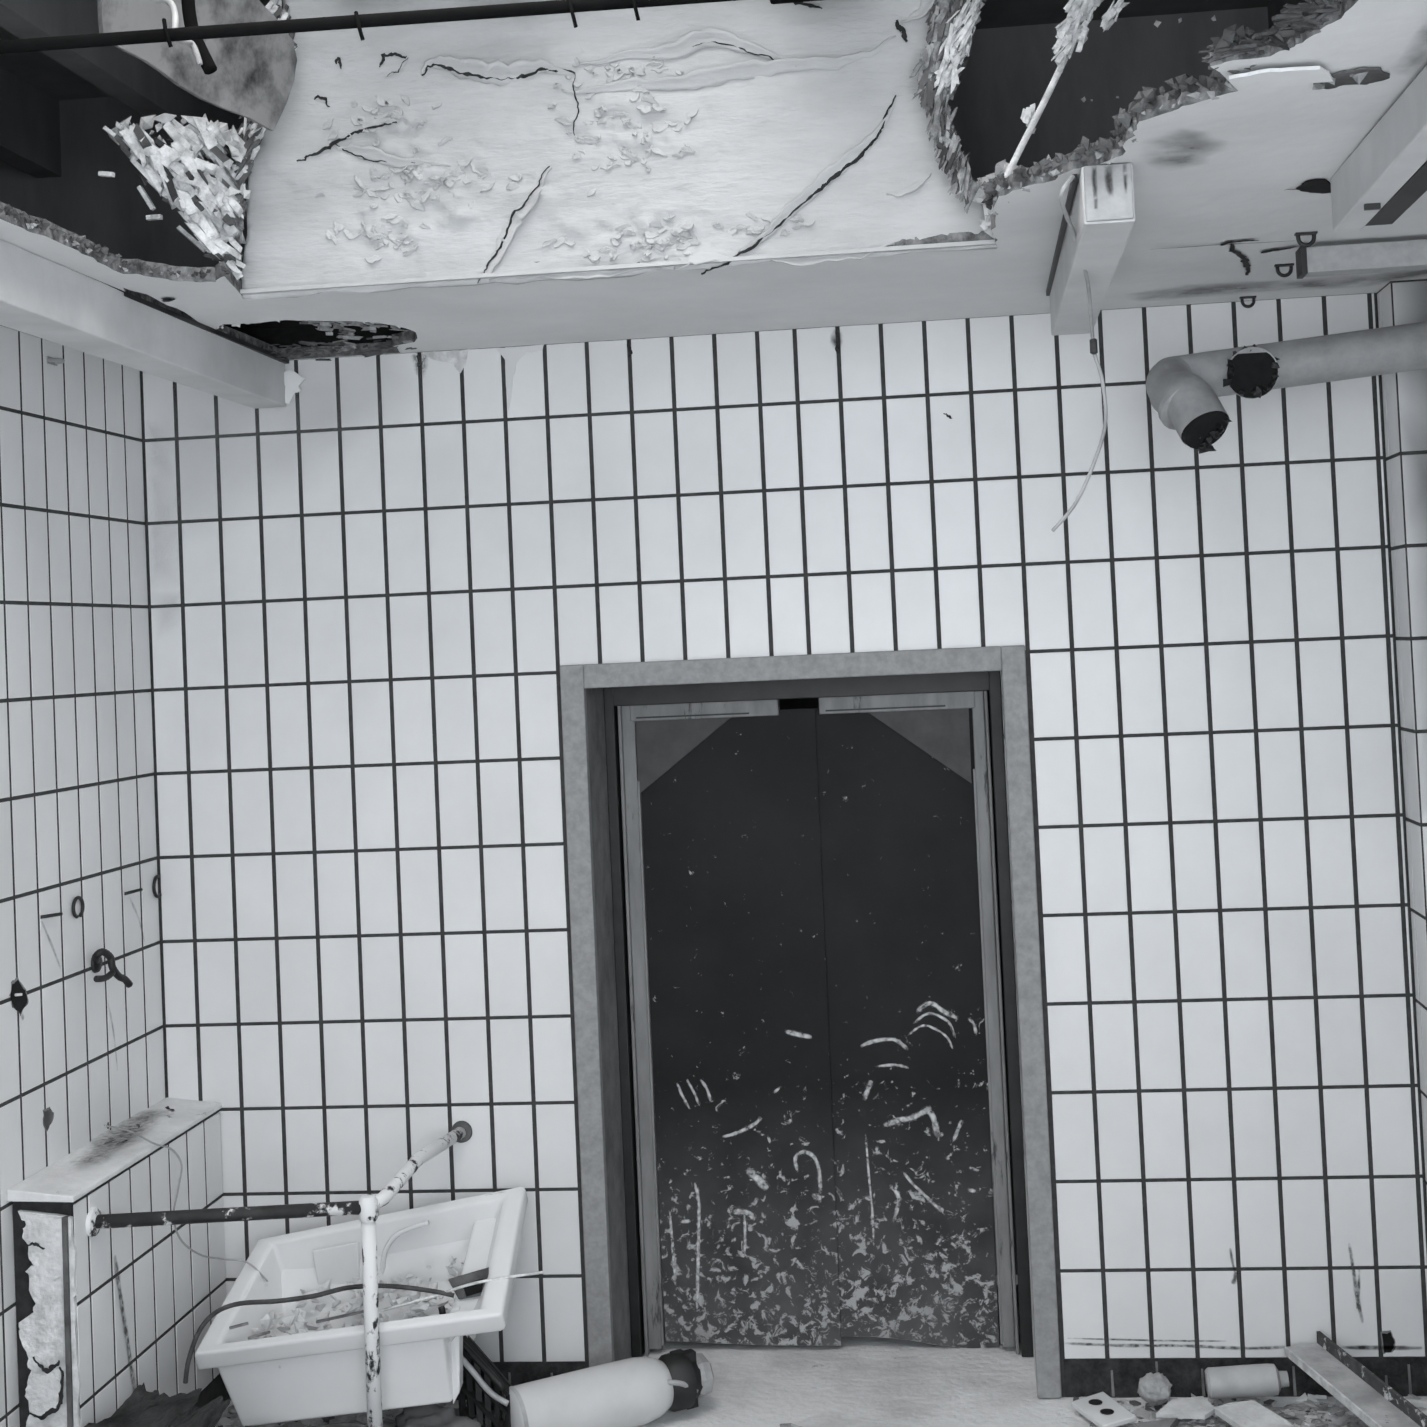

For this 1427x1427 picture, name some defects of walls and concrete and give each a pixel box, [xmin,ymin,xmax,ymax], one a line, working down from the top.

spalling [265,0,298,51]
spalling [0,113,266,284]
crack [296,121,451,168]
peeling [314,94,523,264]
crack [478,166,552,284]
peeling [489,214,727,281]
crack [701,95,897,275]
spalling [379,0,1390,239]
spalling [216,320,417,361]
flaking render [13,1202,81,1427]